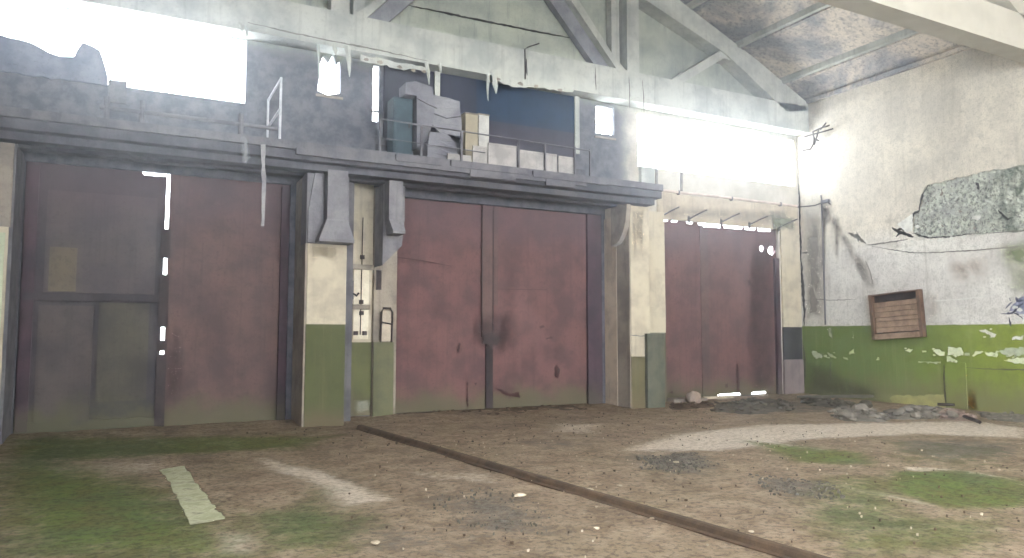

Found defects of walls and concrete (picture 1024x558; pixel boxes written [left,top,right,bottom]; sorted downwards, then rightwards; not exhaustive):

flaking render [898,165,1024,242]
peeling [812,349,854,360]
peeling [905,296,1024,364]